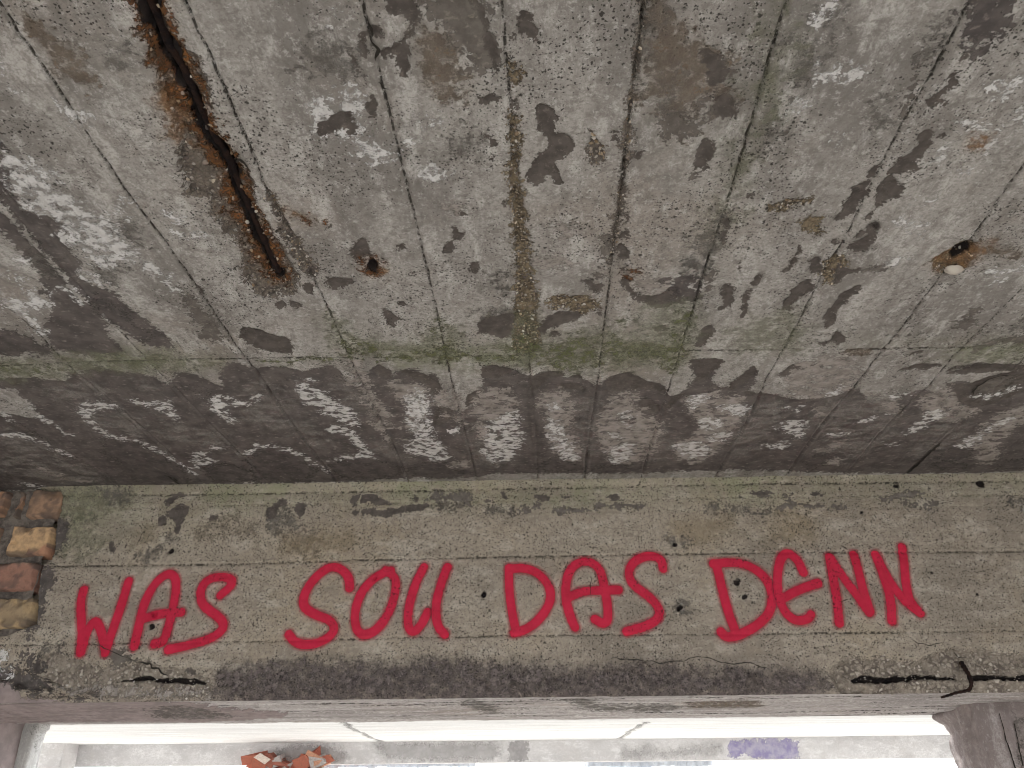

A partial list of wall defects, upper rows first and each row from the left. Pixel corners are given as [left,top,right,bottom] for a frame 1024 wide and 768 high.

water stain [51,97,96,128]
water stain [954,75,1024,156]
water stain [0,142,1024,564]
crack [98,644,181,676]